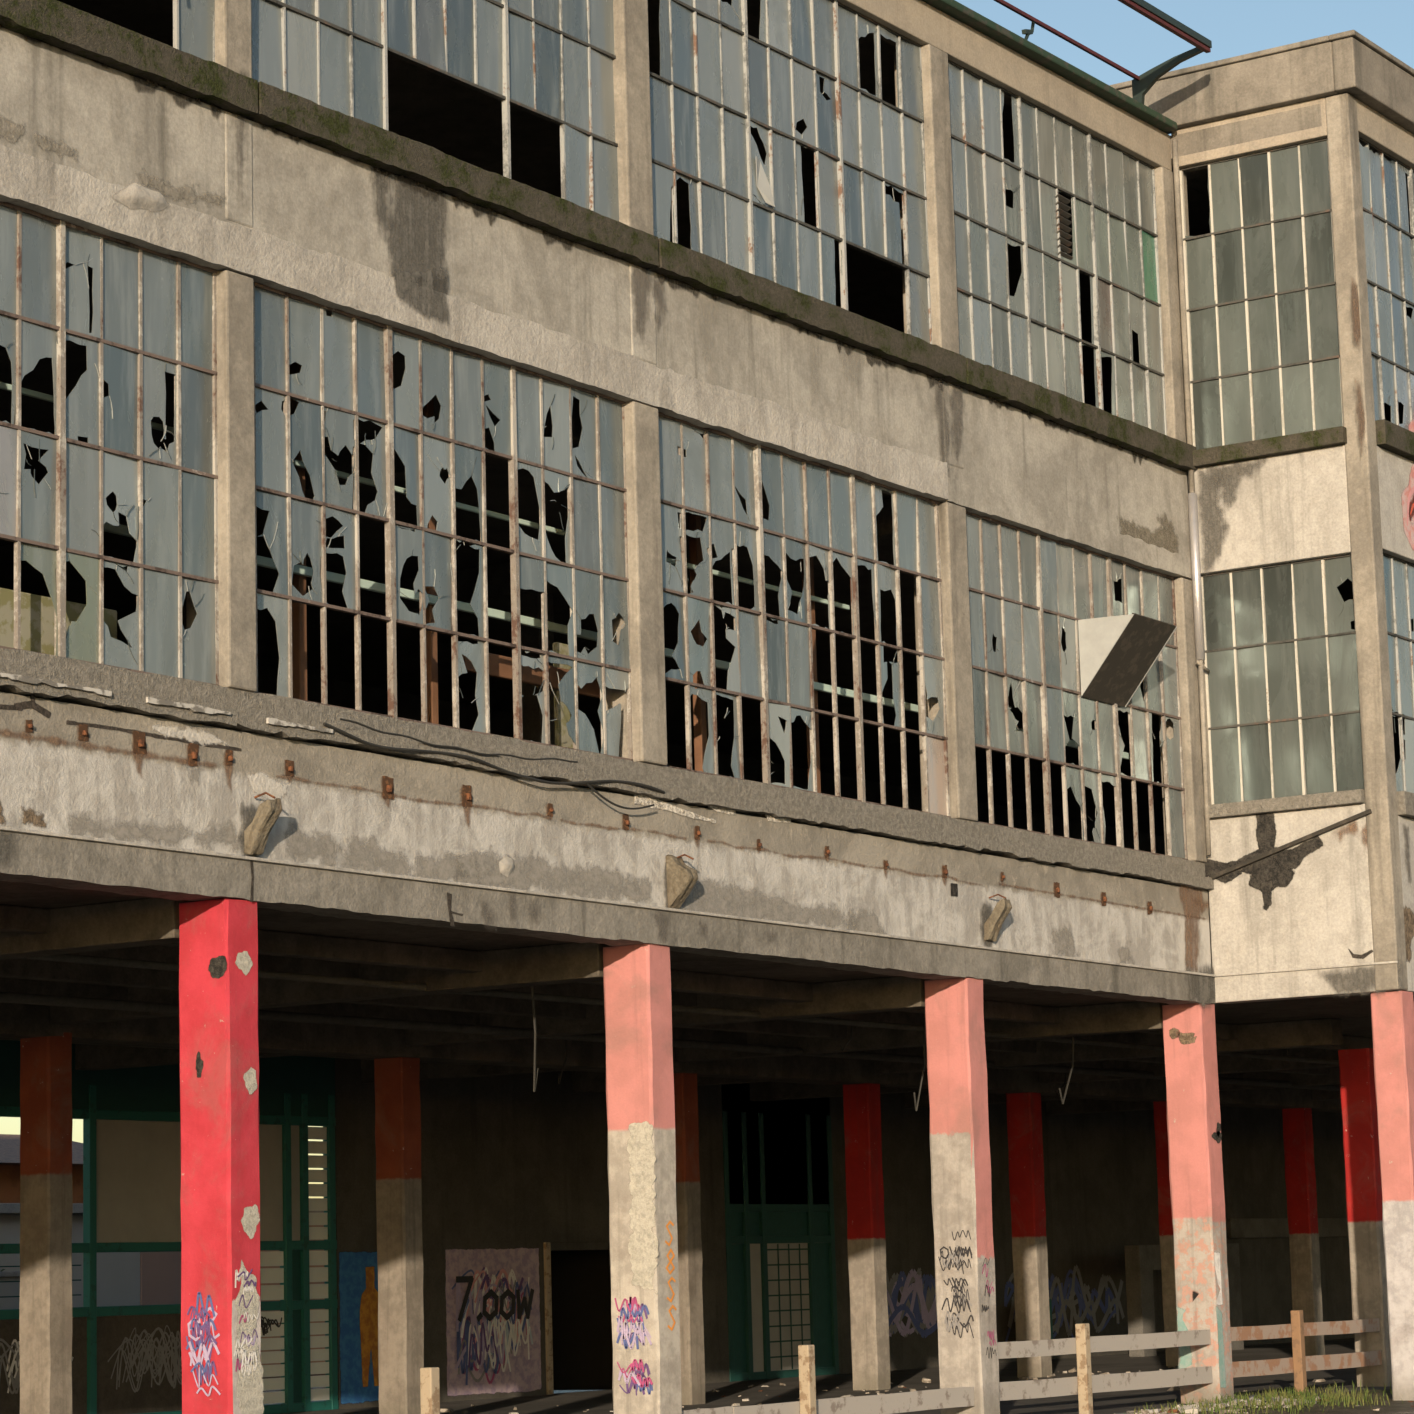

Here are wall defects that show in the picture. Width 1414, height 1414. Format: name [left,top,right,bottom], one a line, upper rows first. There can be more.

damp [240,114,310,156]
damp [332,150,577,322]
damp [593,248,777,333]
damp [793,324,1163,469]
rust [0,720,233,788]
rust [277,760,971,885]
spalling [1205,813,1323,910]
peeling [208,951,253,979]
peeling [243,1067,257,1094]
peeling [241,1204,260,1239]
peeling [626,1121,659,1294]
peeling [235,1261,264,1414]